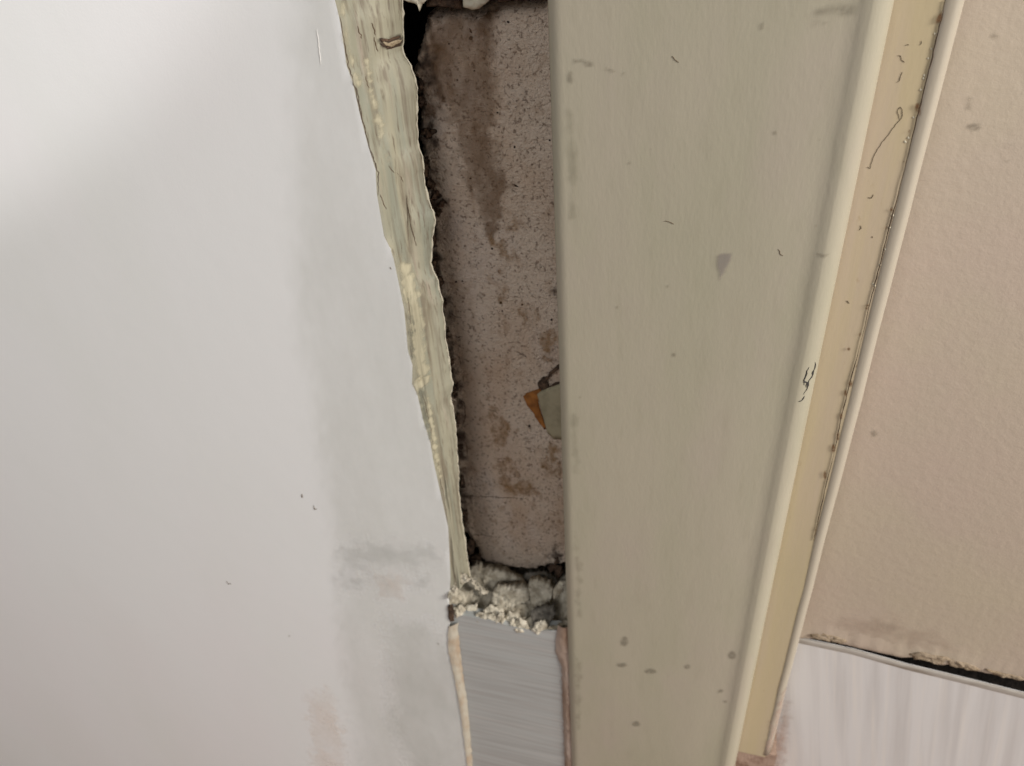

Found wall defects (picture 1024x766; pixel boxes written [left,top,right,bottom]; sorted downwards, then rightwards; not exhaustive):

peeling [335,0,568,635]
flaking render [810,633,847,644]
flaking render [909,652,1024,681]